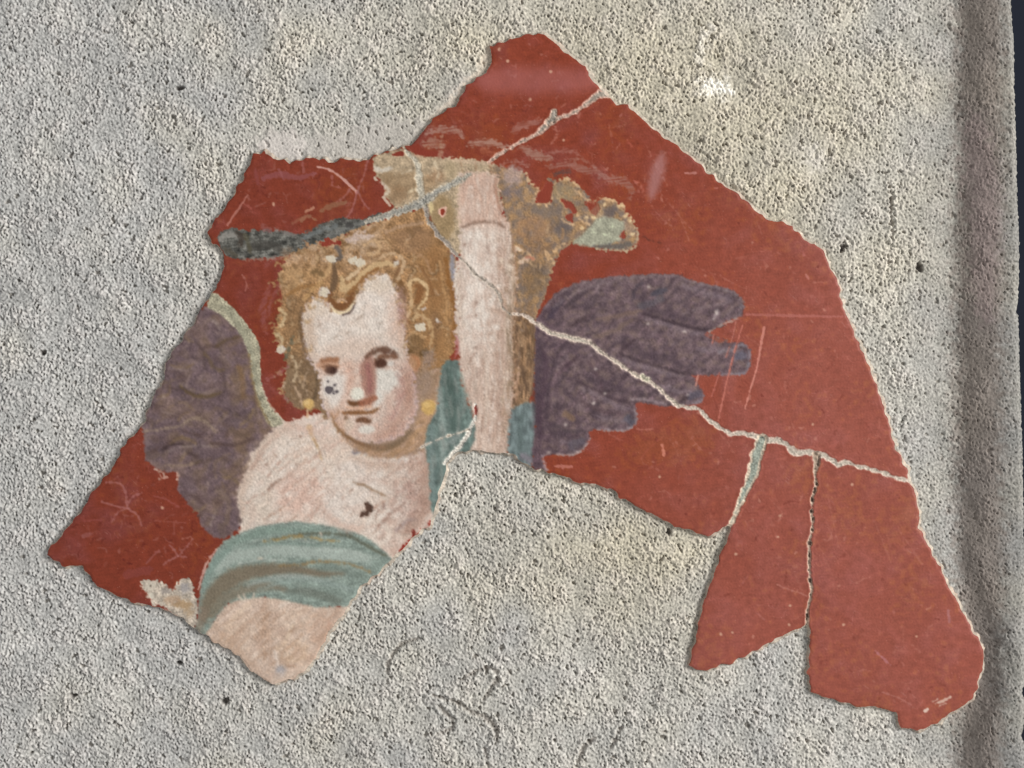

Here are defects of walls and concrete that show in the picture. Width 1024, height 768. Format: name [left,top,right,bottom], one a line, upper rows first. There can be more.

peeling [141,578,199,629]
crack [365,89,909,628]